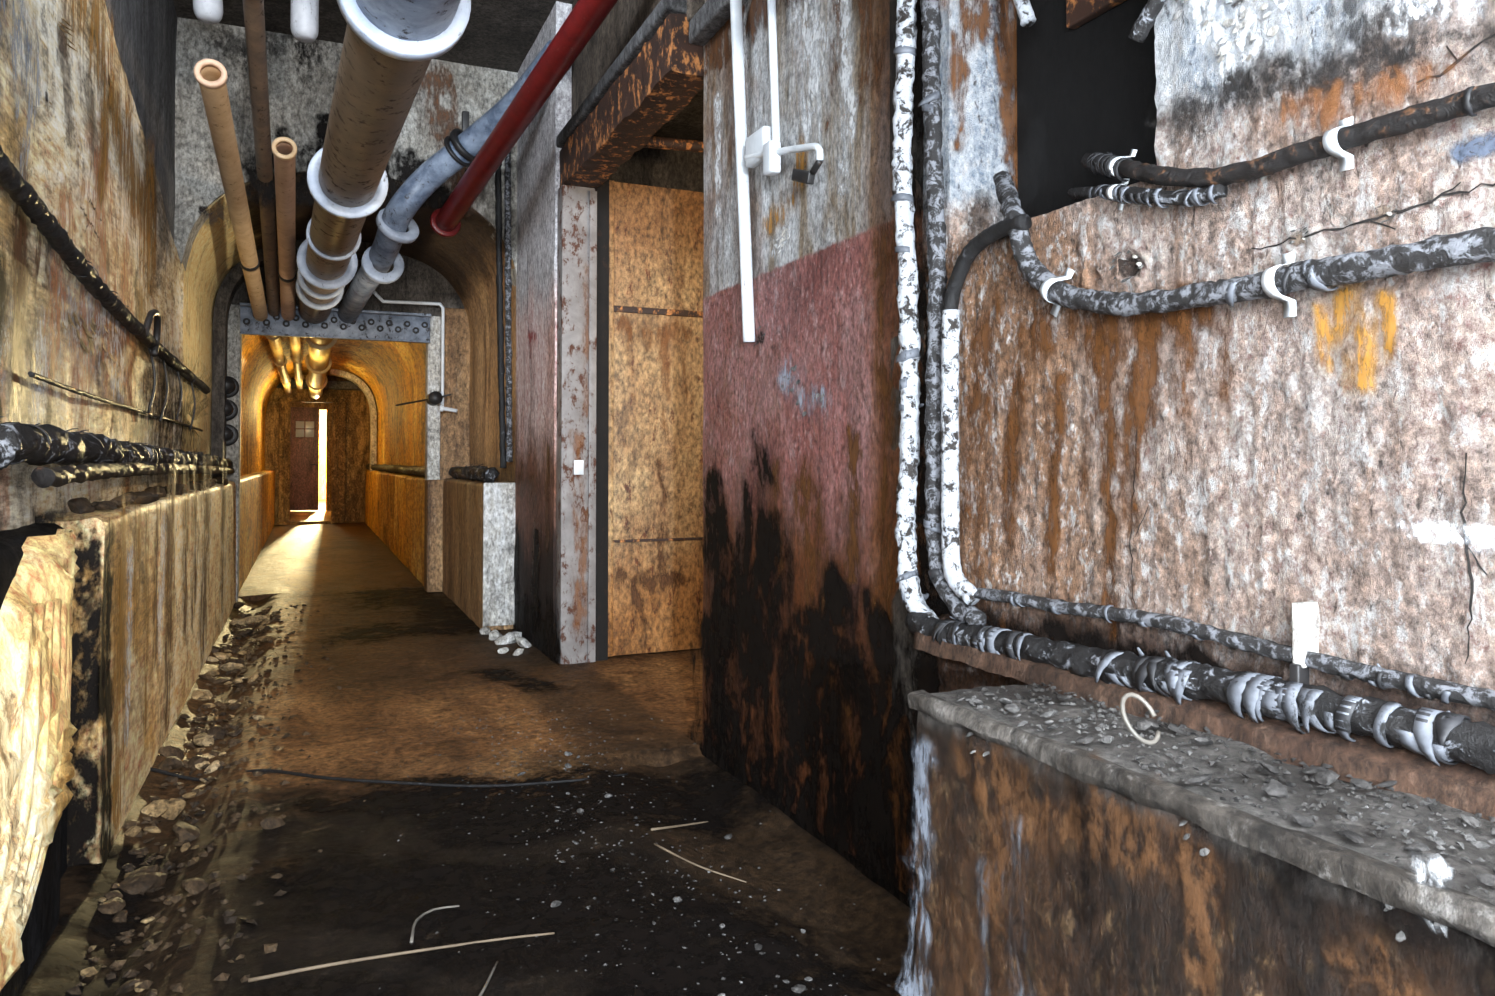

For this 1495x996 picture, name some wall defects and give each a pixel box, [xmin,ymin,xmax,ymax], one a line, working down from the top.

peeling [1395,0,1468,19]
rust [44,139,132,430]
damp [874,216,895,339]
rust [1316,286,1397,392]
damp [876,356,900,554]
rust [999,306,1231,641]
damp [246,425,941,996]